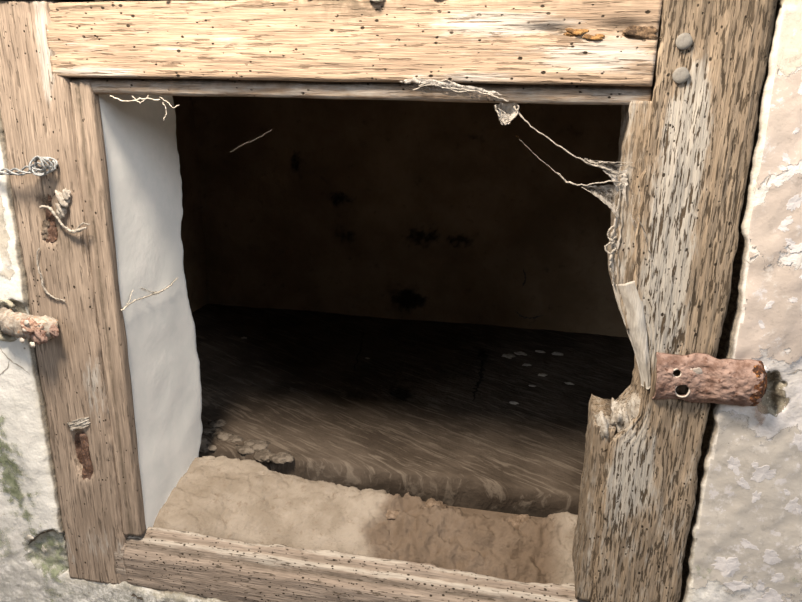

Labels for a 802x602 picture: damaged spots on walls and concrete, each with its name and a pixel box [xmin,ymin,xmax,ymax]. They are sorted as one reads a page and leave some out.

peeling [0,196,15,279]
spalling [0,299,35,348]
peeling [734,0,802,417]
peeling [691,417,802,602]